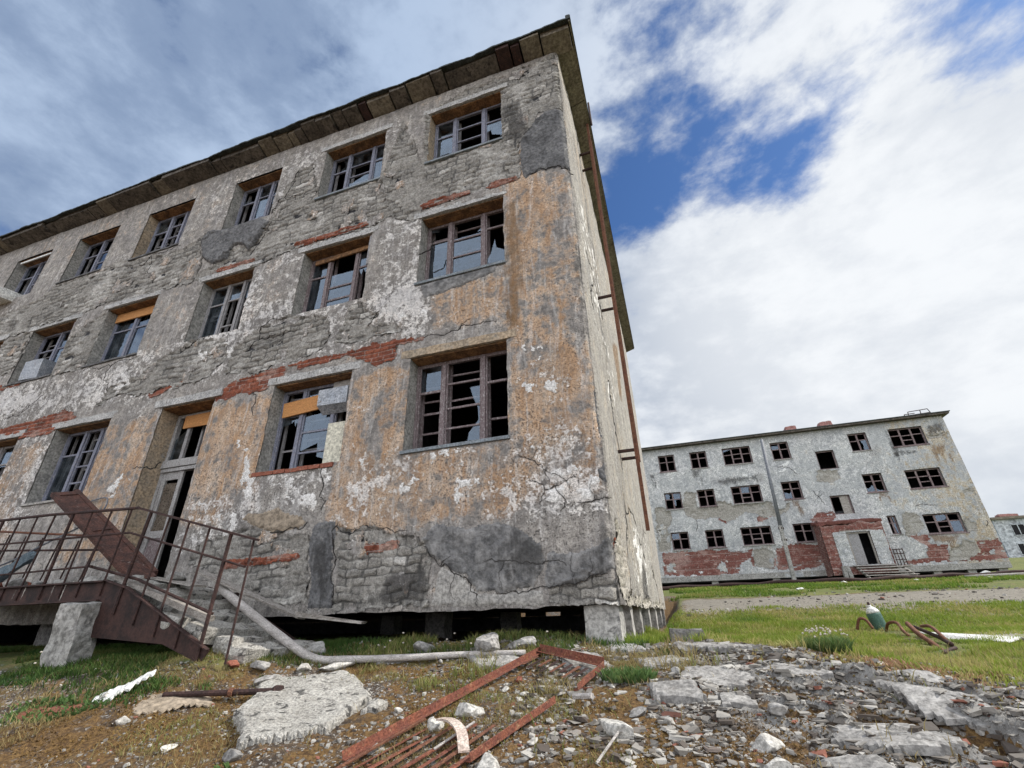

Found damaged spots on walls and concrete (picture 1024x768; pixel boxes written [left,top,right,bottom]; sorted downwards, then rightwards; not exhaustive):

spalling [0,52,563,415]
crack [424,319,496,338]
flaking render [0,409,76,441]
spalling [331,525,433,614]
crack [274,448,660,607]
flaking render [549,492,824,609]
flaking render [810,511,836,528]
flaking render [901,512,1009,565]